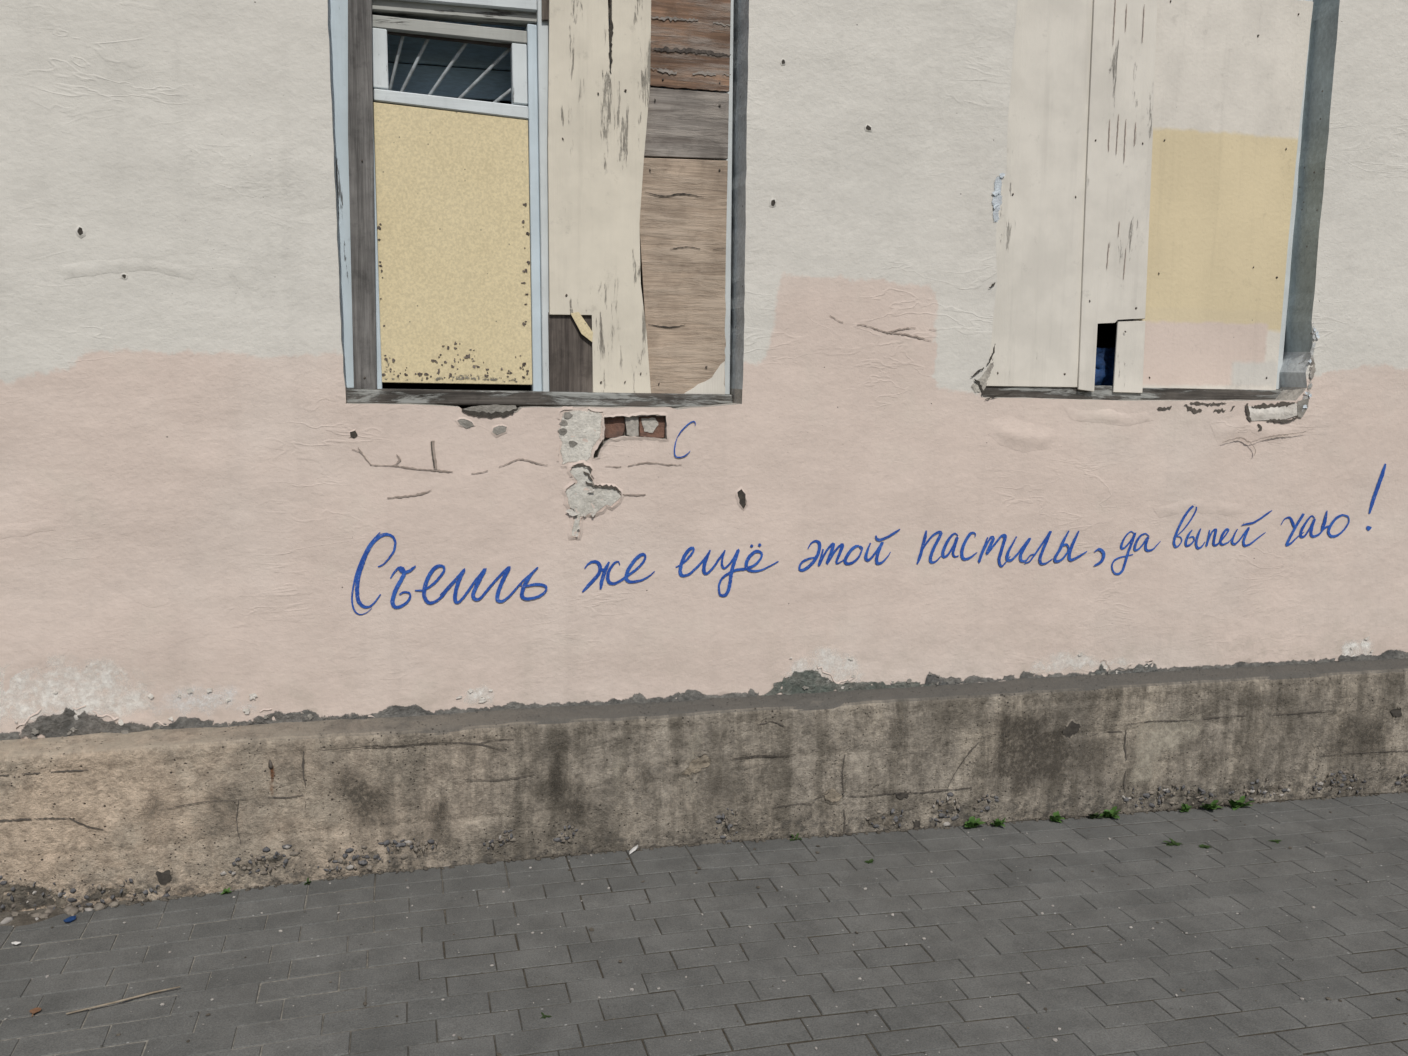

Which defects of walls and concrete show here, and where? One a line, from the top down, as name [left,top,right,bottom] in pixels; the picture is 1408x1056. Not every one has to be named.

flaking render [556,406,670,540]
spalling [16,705,172,740]
spalling [235,708,375,726]
crack [0,768,87,776]
damp [342,777,387,820]
crack [0,817,103,830]